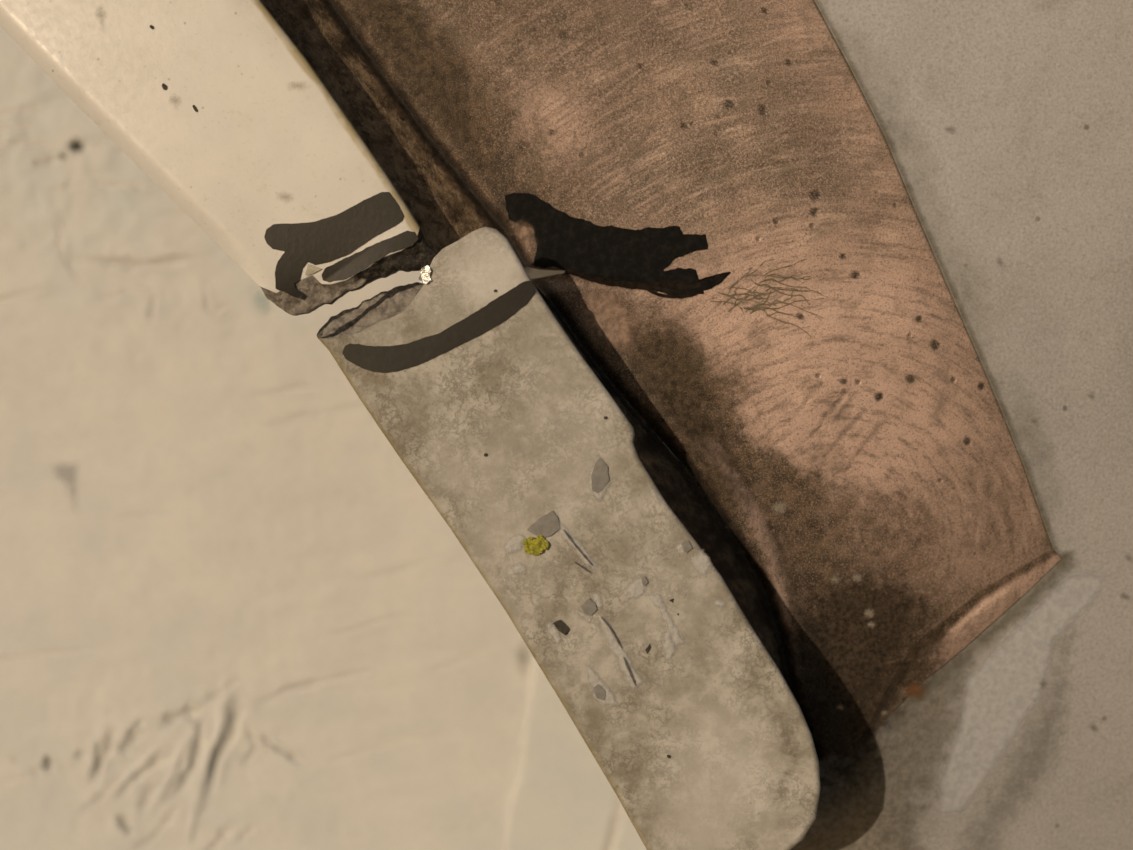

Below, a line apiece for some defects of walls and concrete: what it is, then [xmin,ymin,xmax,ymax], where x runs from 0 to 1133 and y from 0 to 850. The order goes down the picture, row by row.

peeling [305,264,321,275]